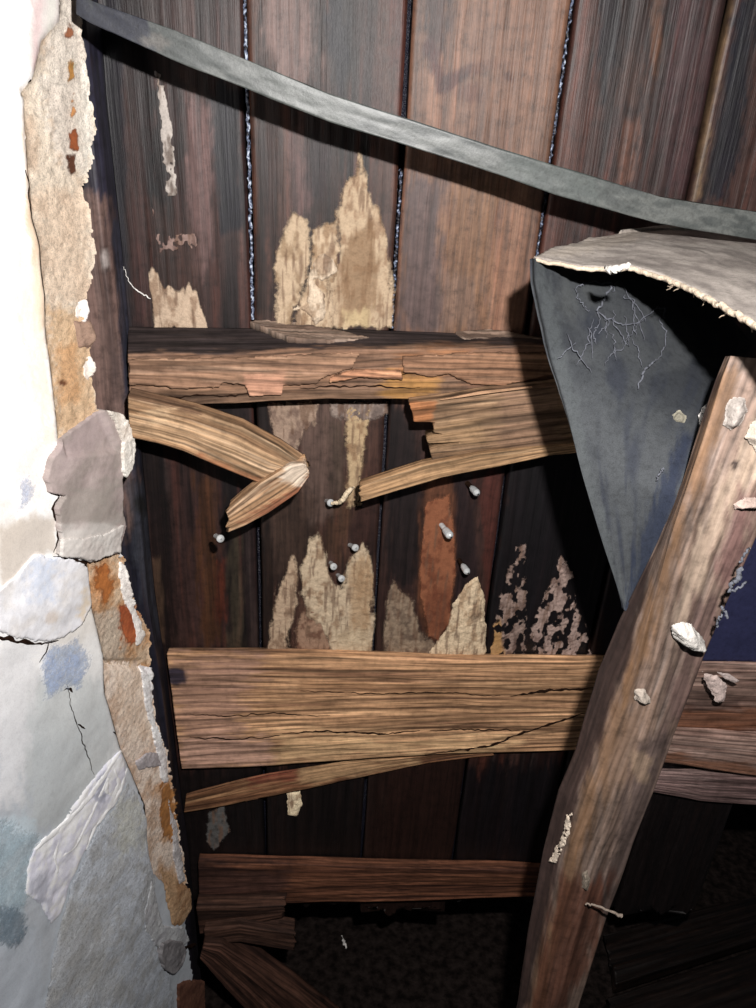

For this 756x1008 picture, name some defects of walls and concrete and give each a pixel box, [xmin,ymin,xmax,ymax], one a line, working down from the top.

spalling [0,0,205,1008]
rust [94,563,114,605]
rust [118,605,136,645]
crack [65,686,94,774]